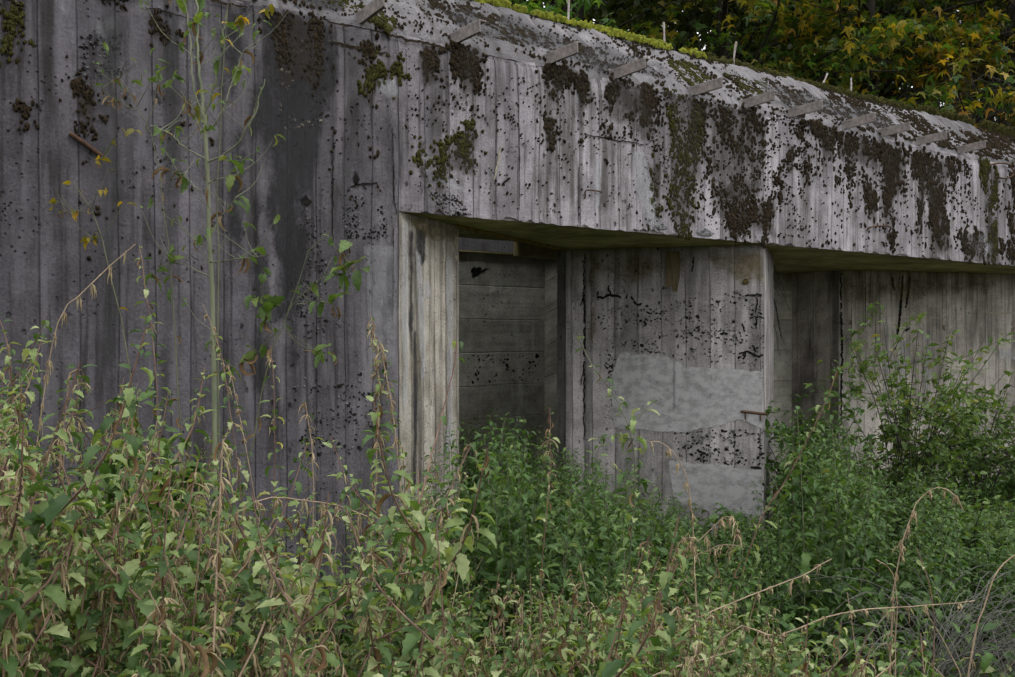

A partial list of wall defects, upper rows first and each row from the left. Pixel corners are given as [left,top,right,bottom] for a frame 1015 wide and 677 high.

water stain [224,13,243,93]
water stain [228,6,338,363]
water stain [251,329,271,391]